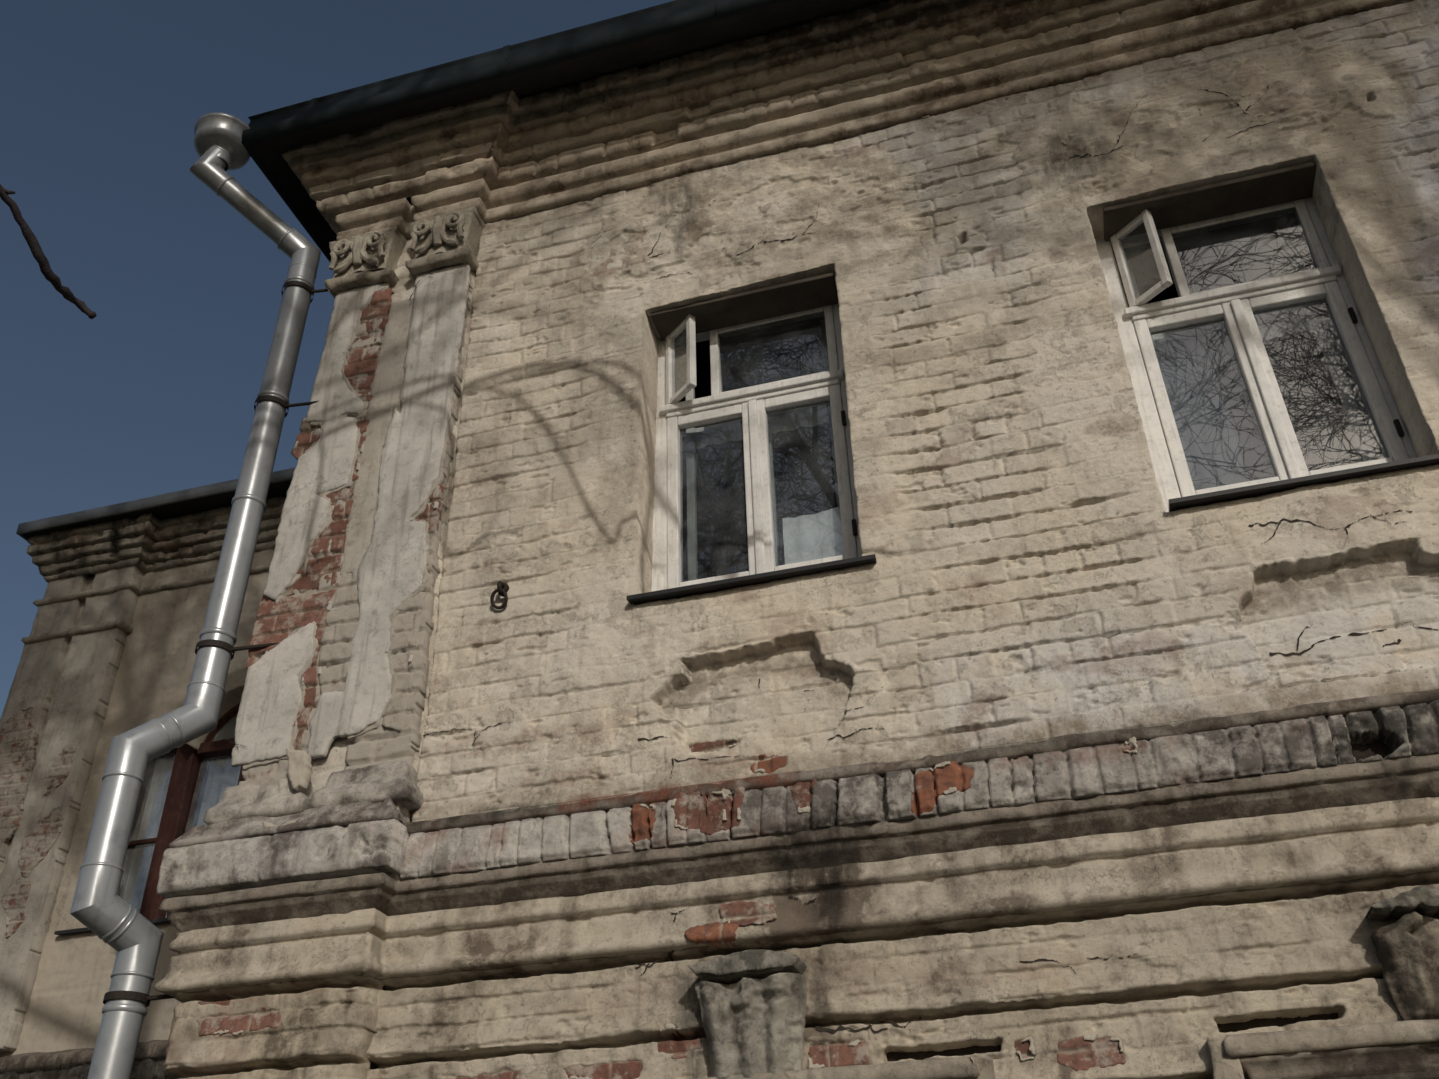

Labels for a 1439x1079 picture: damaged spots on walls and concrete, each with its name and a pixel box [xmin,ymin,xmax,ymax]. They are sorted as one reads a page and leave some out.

flaking render [246,287,394,793]
flaking render [409,472,446,547]
crack [1249,510,1412,544]
crack [1269,622,1439,656]
flaking render [0,706,77,938]
spalling [629,752,792,844]
spalling [911,761,974,818]
spalling [685,901,777,949]
spalling [564,1060,643,1079]
spalling [657,1024,703,1059]
spalling [808,1037,1035,1069]
spalling [1057,1033,1126,1071]